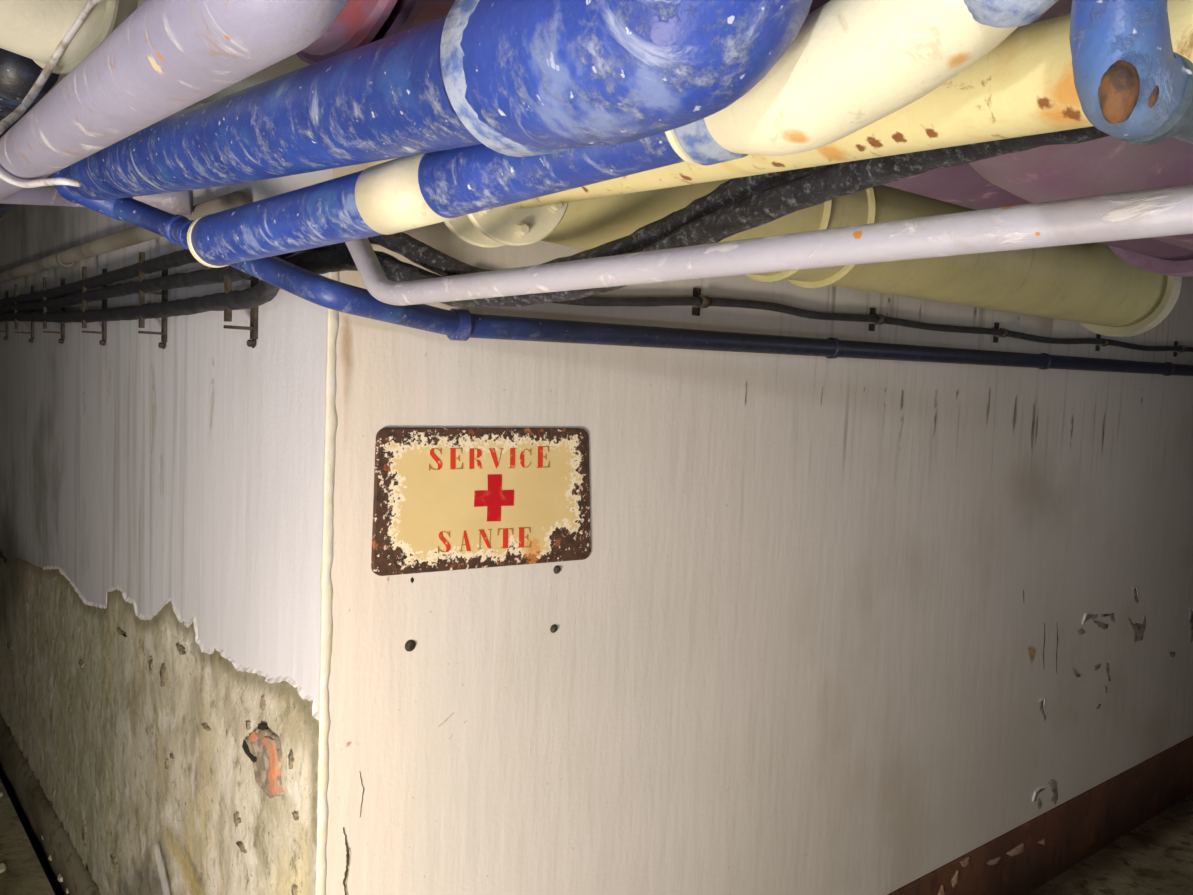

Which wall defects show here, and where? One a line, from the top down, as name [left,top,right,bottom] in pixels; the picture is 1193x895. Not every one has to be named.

spalling [0,308,339,895]
spalling [1077,587,1146,642]
spalling [1032,779,1058,810]
crack [343,773,364,895]
peeling [938,857,970,895]
peeling [986,839,1046,866]